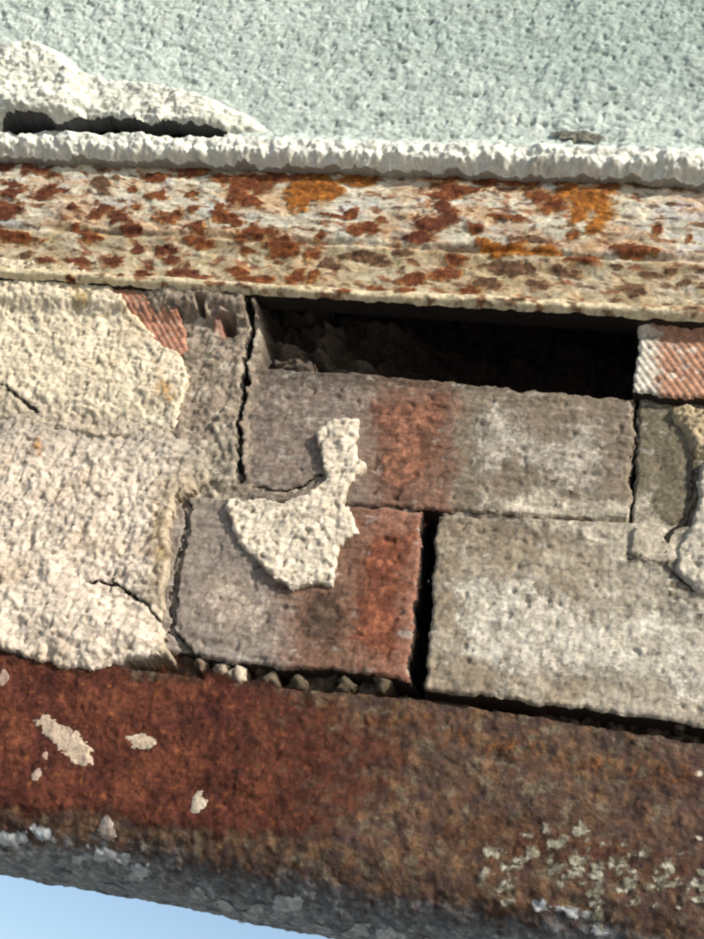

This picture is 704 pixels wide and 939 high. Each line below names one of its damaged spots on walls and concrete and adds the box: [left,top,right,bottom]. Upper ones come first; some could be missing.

rust [0,163,704,309]
crack [235,297,323,496]
crack [89,503,200,660]
crack [664,456,695,592]
rust [0,653,409,845]
rust [437,811,696,889]